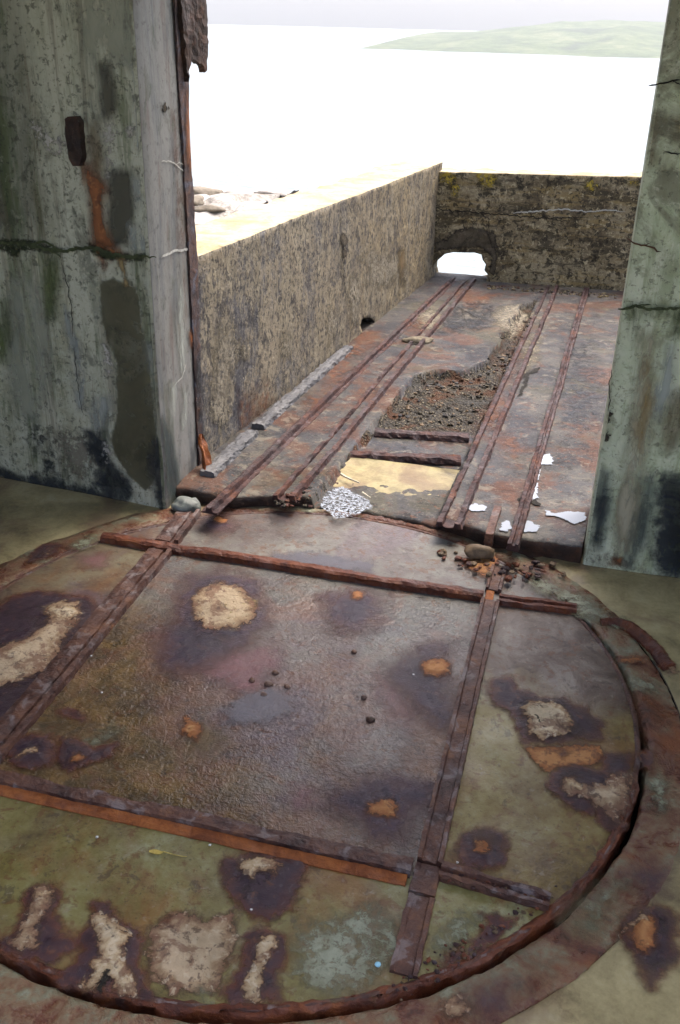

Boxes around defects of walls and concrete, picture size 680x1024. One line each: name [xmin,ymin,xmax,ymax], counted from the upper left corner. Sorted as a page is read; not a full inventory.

corrosion [81,165,129,287]
spalling [435,227,499,275]
crack [437,207,624,229]
crack [0,240,188,410]
crack [618,303,680,311]
leakage [0,279,181,510]
leakage [593,336,680,578]
corrosion [388,641,453,729]
corrosion [0,676,640,1024]
spalling [606,774,640,873]
peeling [143,905,239,997]
corrosion [618,904,680,992]